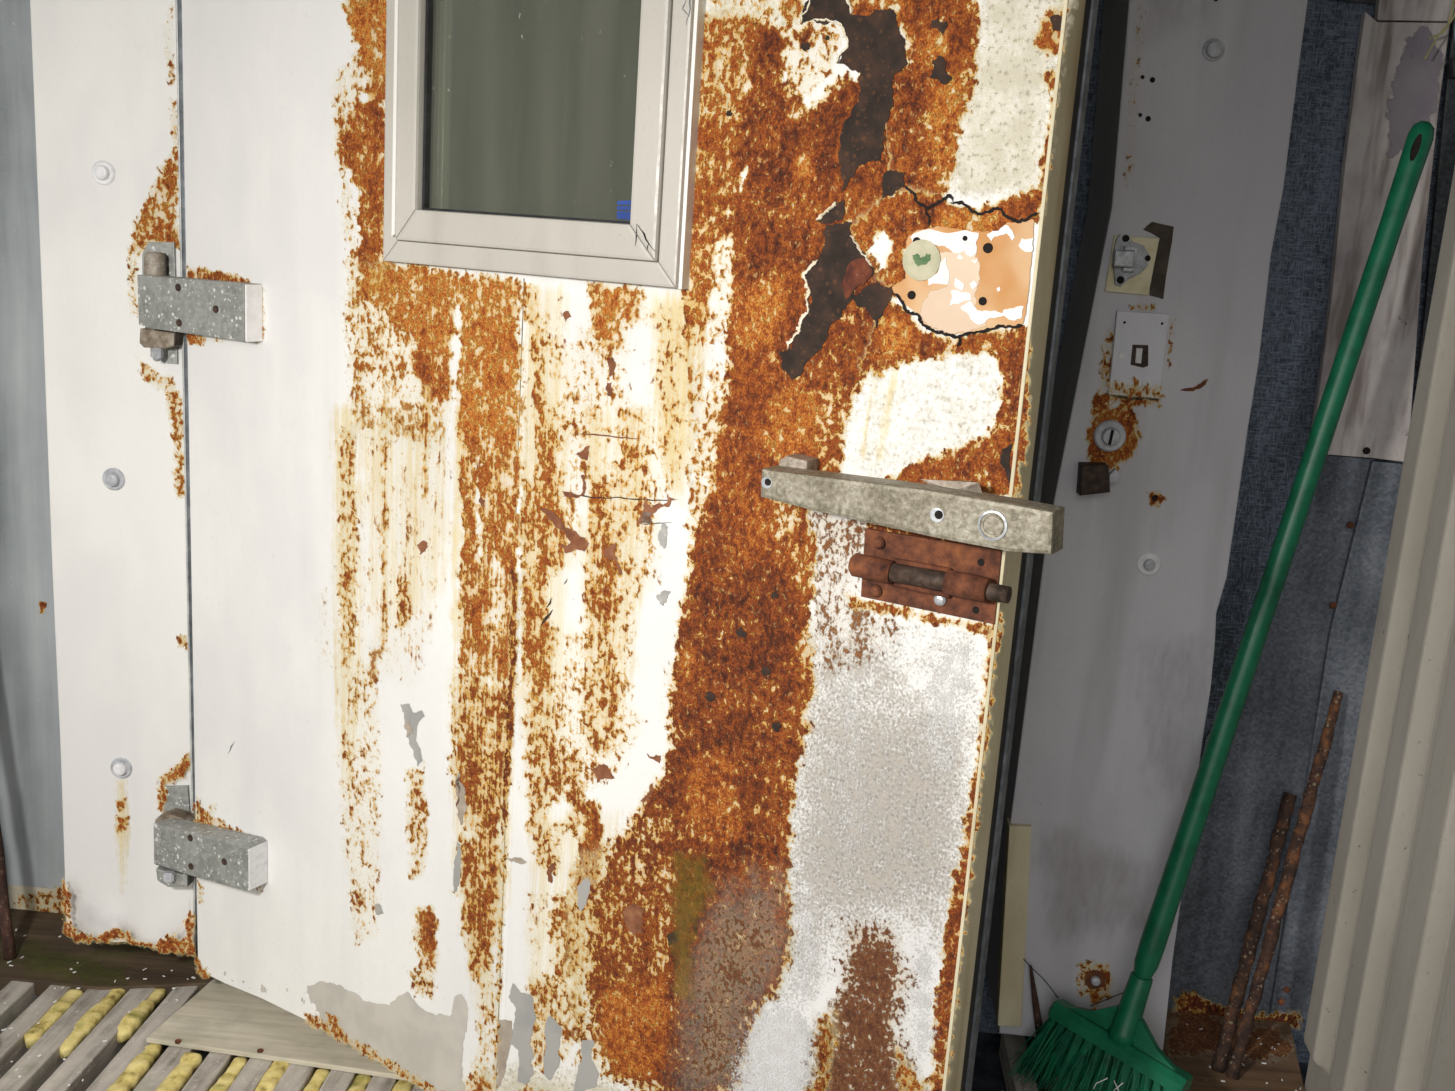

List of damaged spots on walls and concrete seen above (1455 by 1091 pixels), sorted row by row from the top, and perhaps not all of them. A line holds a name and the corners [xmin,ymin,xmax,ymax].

crack [904,185,1040,226]
crack [891,292,1023,347]
peeling [892,219,1034,334]
corrosion [140,362,185,497]
corrosion [1086,333,1165,471]
corrosion [304,0,1069,1091]
peeling [400,704,425,766]
corrosion [192,800,242,832]
corrosion [13,880,211,979]
peeling [287,981,468,1091]
corrosion [1076,959,1112,1010]
corrosion [1165,989,1304,1065]